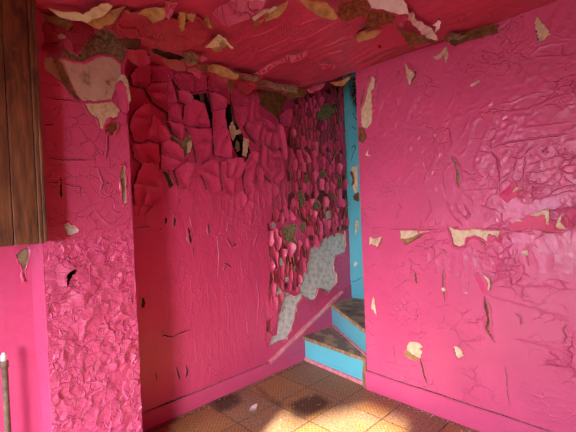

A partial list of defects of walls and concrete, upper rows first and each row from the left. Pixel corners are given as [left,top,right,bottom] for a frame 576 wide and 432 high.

flaking render [336,0,499,63]
peeling [358,75,379,143]
crack [45,132,110,190]
crack [45,177,121,228]
peeling [38,0,359,347]
peeling [400,207,576,285]
crack [490,121,576,193]
crack [501,227,576,235]
peeling [46,252,141,429]
peeling [404,342,423,361]
crack [440,269,448,303]
crack [486,272,576,355]